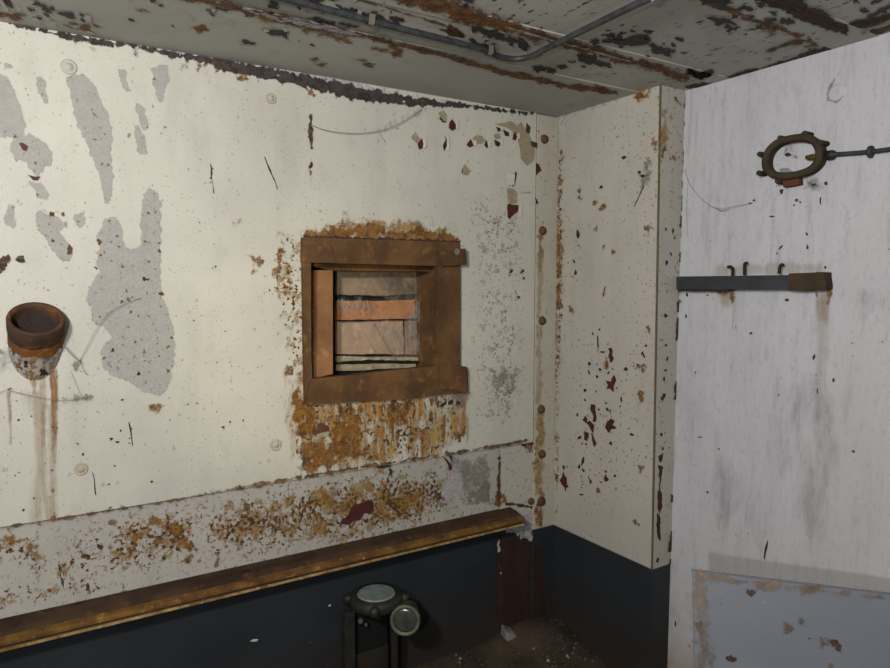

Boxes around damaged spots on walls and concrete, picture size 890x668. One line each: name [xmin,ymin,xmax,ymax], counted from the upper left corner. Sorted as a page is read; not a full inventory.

peeling [531,30,684,74]
peeling [705,0,795,36]
peeling [0,63,52,200]
peeling [66,74,114,203]
peeling [466,118,542,175]
peeling [36,211,86,261]
peeling [86,188,176,396]
peeling [466,171,539,422]
rust [555,150,574,415]
rust [0,219,559,609]
peeling [559,456,616,496]
peeling [573,328,622,446]